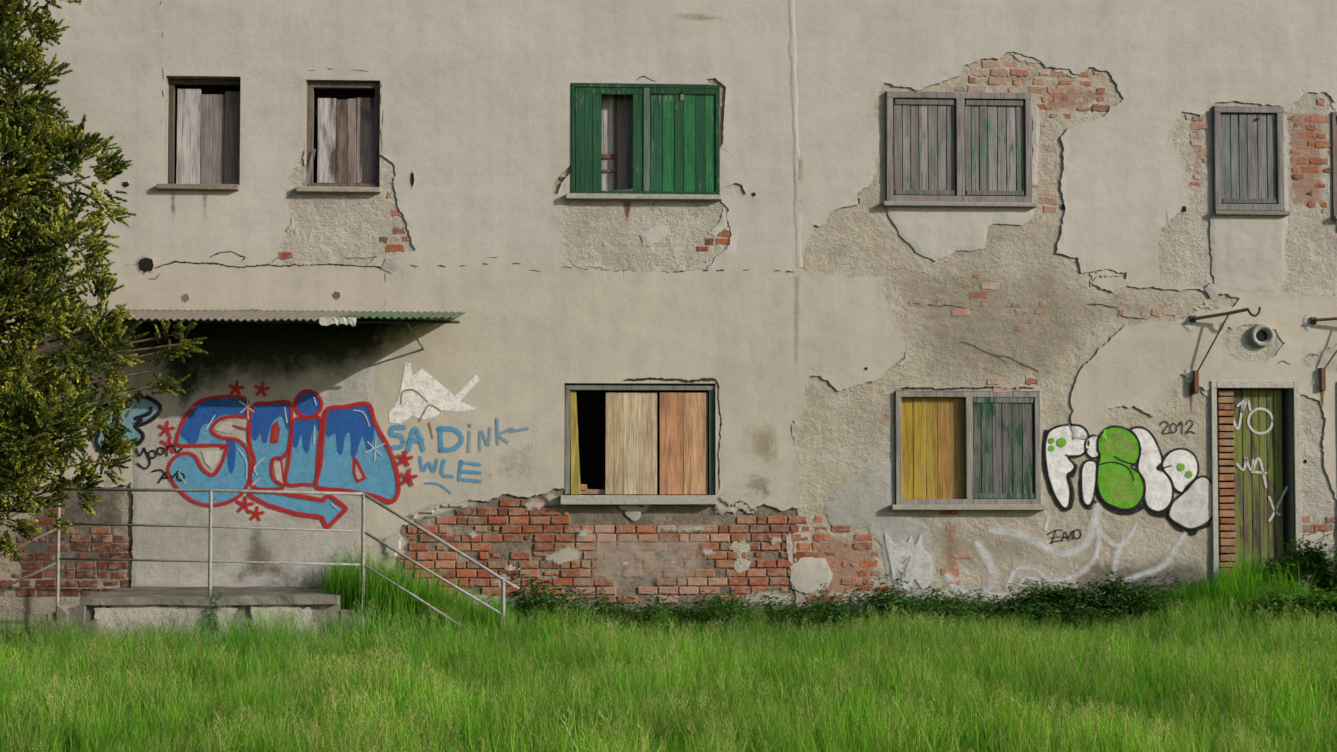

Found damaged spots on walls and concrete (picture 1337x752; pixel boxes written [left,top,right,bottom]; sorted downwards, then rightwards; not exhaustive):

flaking render [278,152,415,265]
crack [154,251,793,305]
flaking render [385,52,1337,620]
spalling [0,483,320,650]